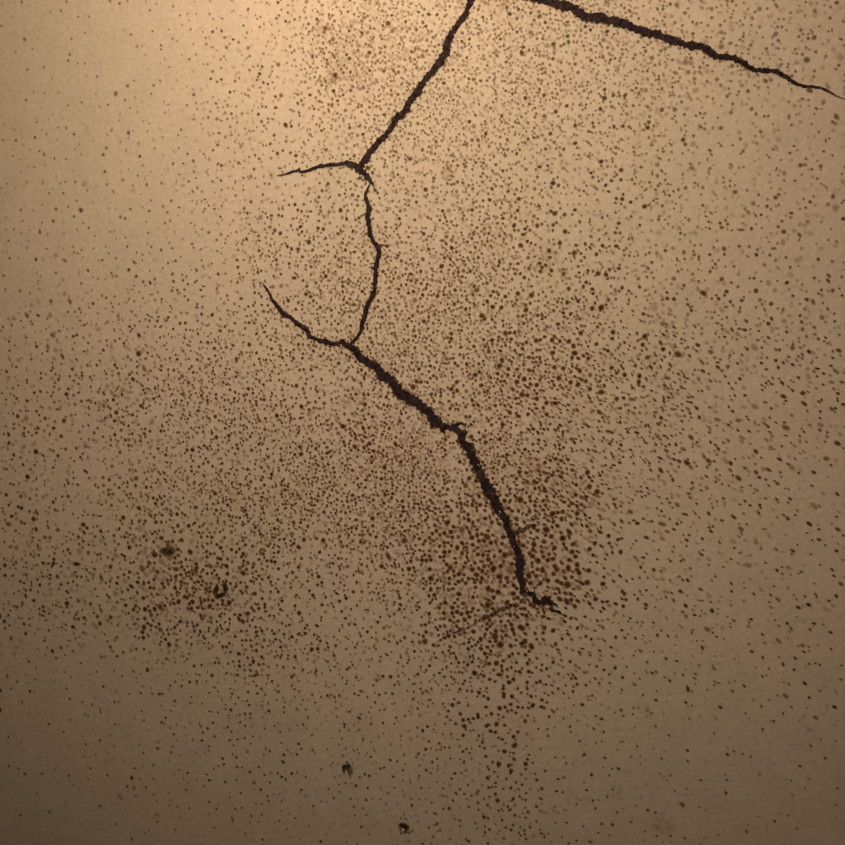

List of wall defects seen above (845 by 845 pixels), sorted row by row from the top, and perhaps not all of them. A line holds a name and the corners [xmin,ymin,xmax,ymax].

crack [260,0,563,645]
crack [520,0,845,102]